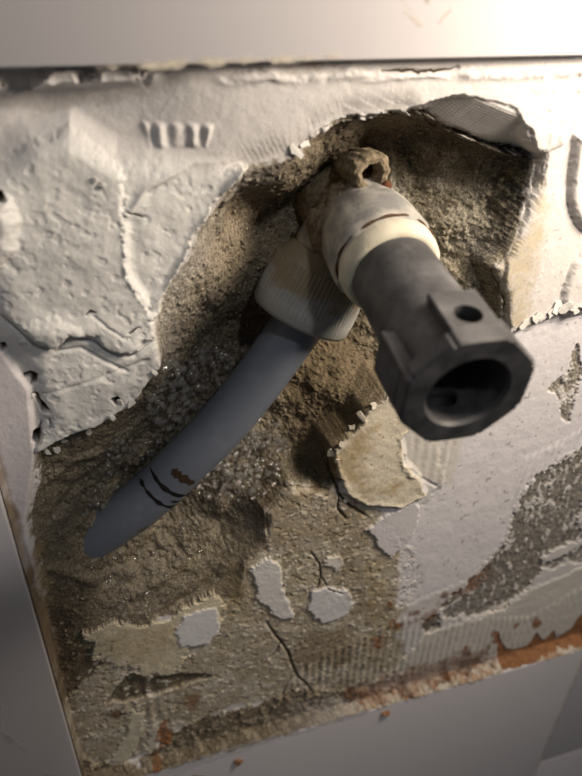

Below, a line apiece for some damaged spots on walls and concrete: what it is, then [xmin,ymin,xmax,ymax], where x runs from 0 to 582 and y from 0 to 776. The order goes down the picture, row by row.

spalling [0,108,582,706]
crack [321,442,366,516]
crack [266,622,309,697]
spalling [76,670,456,776]